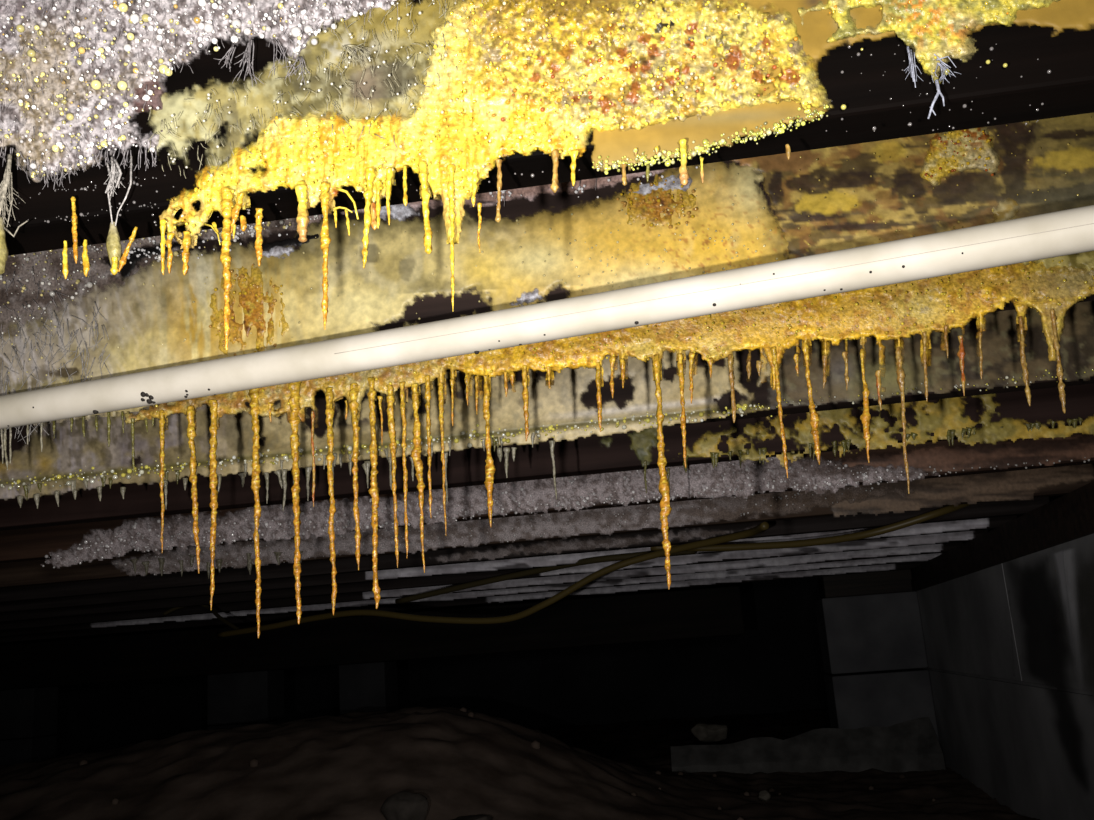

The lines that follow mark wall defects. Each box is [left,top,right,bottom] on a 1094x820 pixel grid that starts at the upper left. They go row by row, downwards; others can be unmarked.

corrosion [209,264,289,356]
leakage [0,0,1094,396]
leakage [0,301,1094,628]